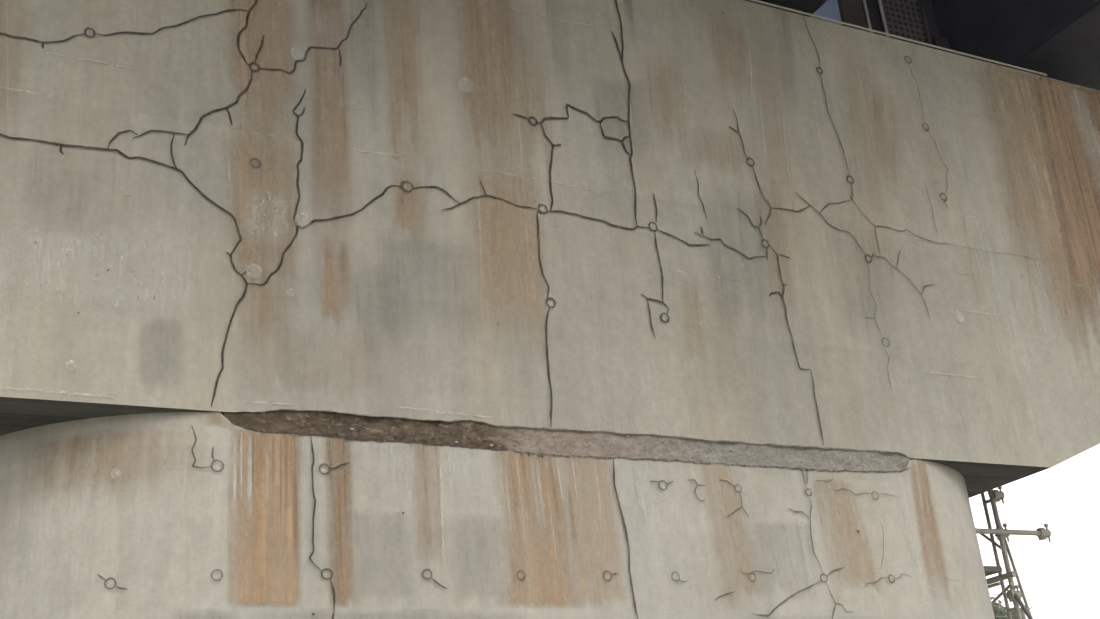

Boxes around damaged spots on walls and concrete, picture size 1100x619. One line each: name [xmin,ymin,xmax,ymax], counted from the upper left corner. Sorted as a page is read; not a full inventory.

crack [0,0,946,445]
corrosion [1035,77,1100,324]
crack [192,427,224,472]
corrosion [234,431,298,604]
crack [309,435,350,619]
spalling [223,409,910,473]
crack [603,459,638,619]
crack [715,570,774,600]
crack [752,467,892,619]